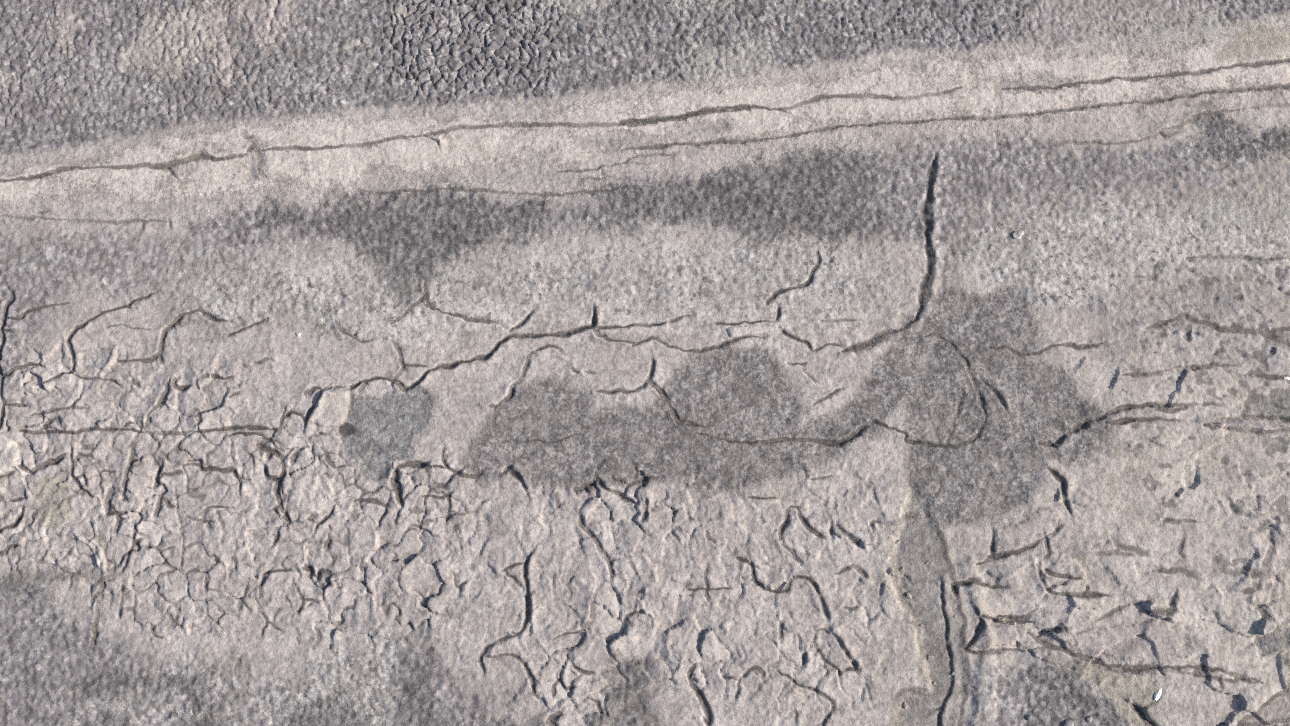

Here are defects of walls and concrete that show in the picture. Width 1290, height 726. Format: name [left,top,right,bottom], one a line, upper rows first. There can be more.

crack [0,145,343,182]
crack [381,130,445,145]
crack [481,121,558,129]
crack [626,110,729,146]
crack [740,94,924,127]
crack [1002,59,1290,115]
crack [1153,317,1227,332]
leakage [342,386,433,481]
crack [0,159,1104,726]
leakage [460,285,1114,527]
crack [935,372,1263,726]
leakage [1055,661,1160,726]